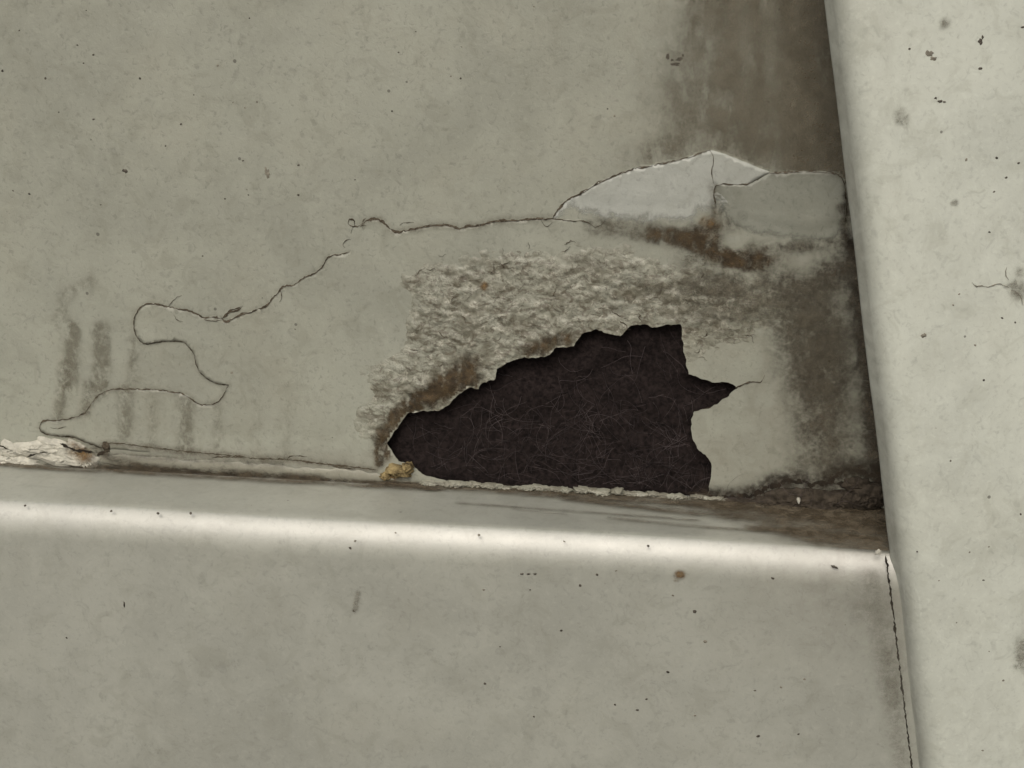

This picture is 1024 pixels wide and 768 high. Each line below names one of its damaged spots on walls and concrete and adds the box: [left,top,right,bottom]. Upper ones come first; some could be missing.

water stain [755,0,846,184]
peeling [0,252,357,468]
crack [39,150,847,477]
corrosion [646,211,770,271]
water stain [656,204,882,486]
spalling [418,479,728,501]